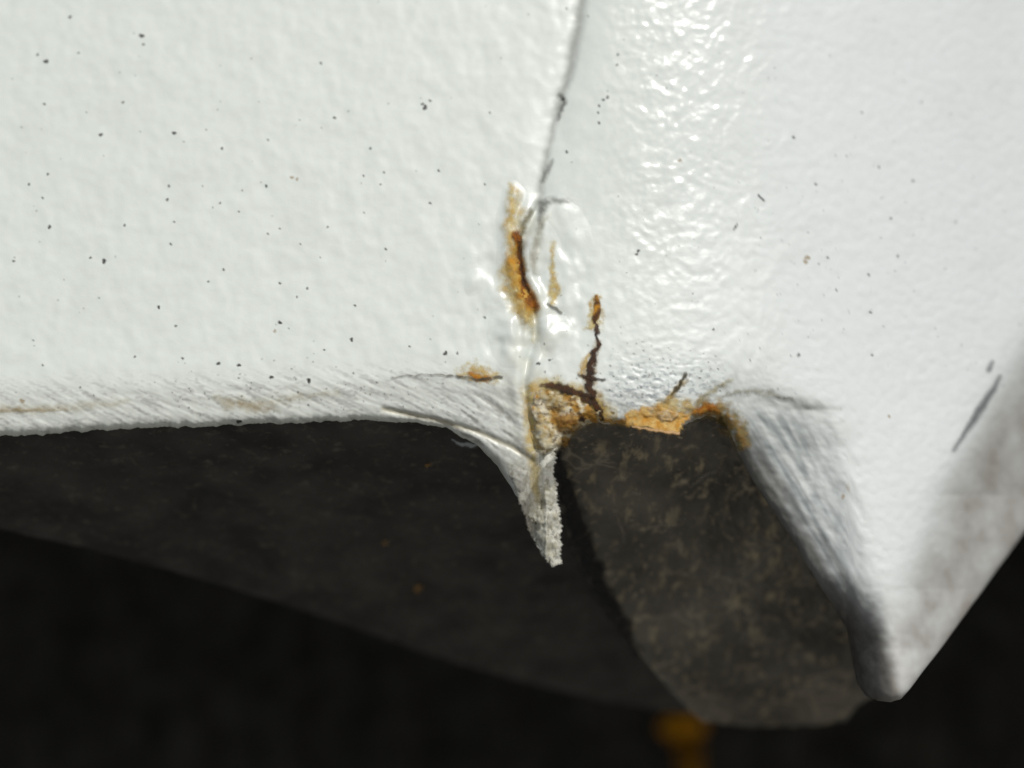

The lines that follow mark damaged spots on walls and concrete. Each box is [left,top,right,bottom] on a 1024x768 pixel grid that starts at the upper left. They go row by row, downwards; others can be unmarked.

corrosion [502,186,562,322]
corrosion [459,366,497,381]
crack [540,321,605,421]
corrosion [601,372,750,450]
peeling [508,380,612,566]